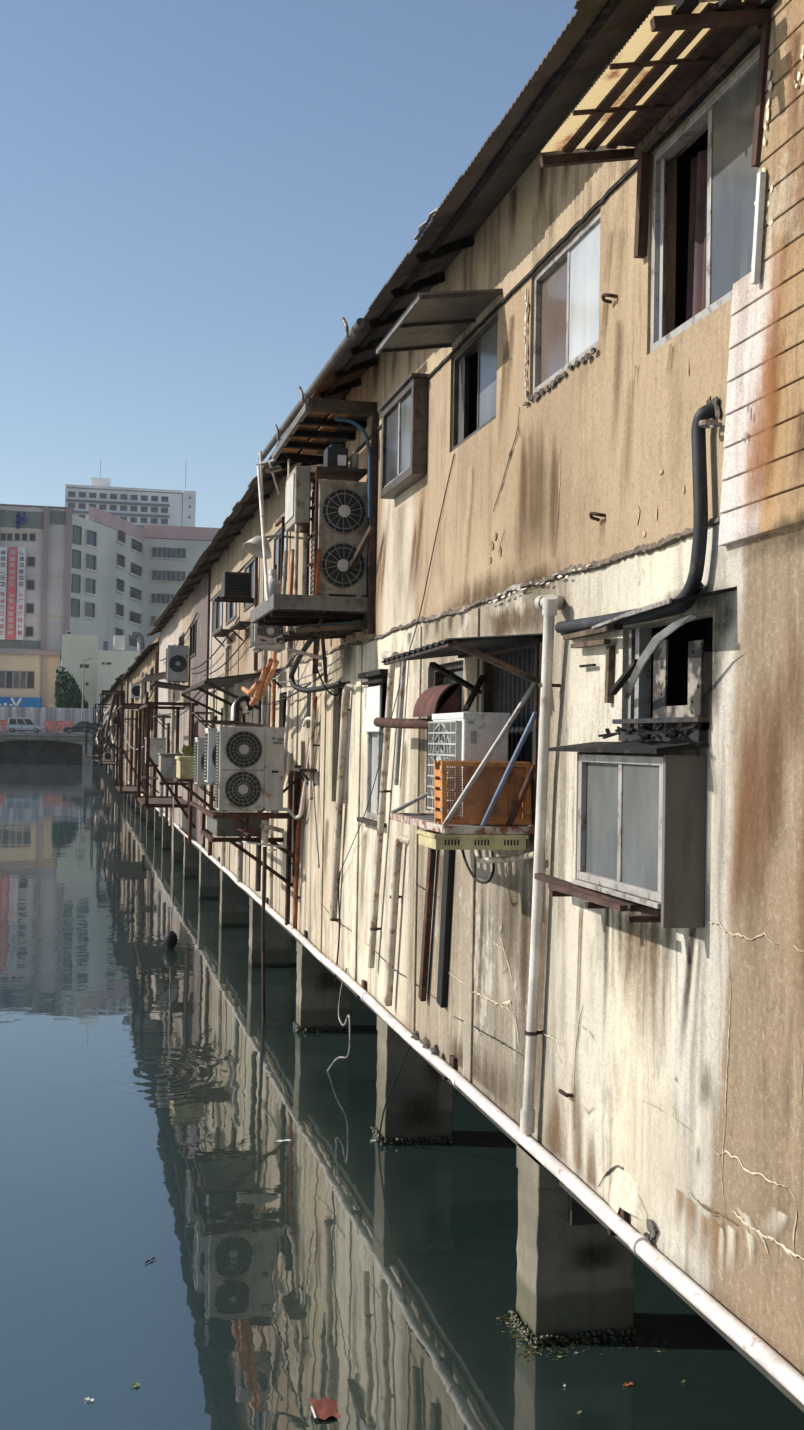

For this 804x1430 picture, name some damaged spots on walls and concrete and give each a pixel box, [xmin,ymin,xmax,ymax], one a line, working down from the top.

water stain [519,449,557,540]
water stain [402,729,423,800]
water stain [322,973,338,988]
water stain [504,889,528,989]
water stain [604,908,670,980]
water stain [684,928,698,1014]
crack [643,919,804,1261]